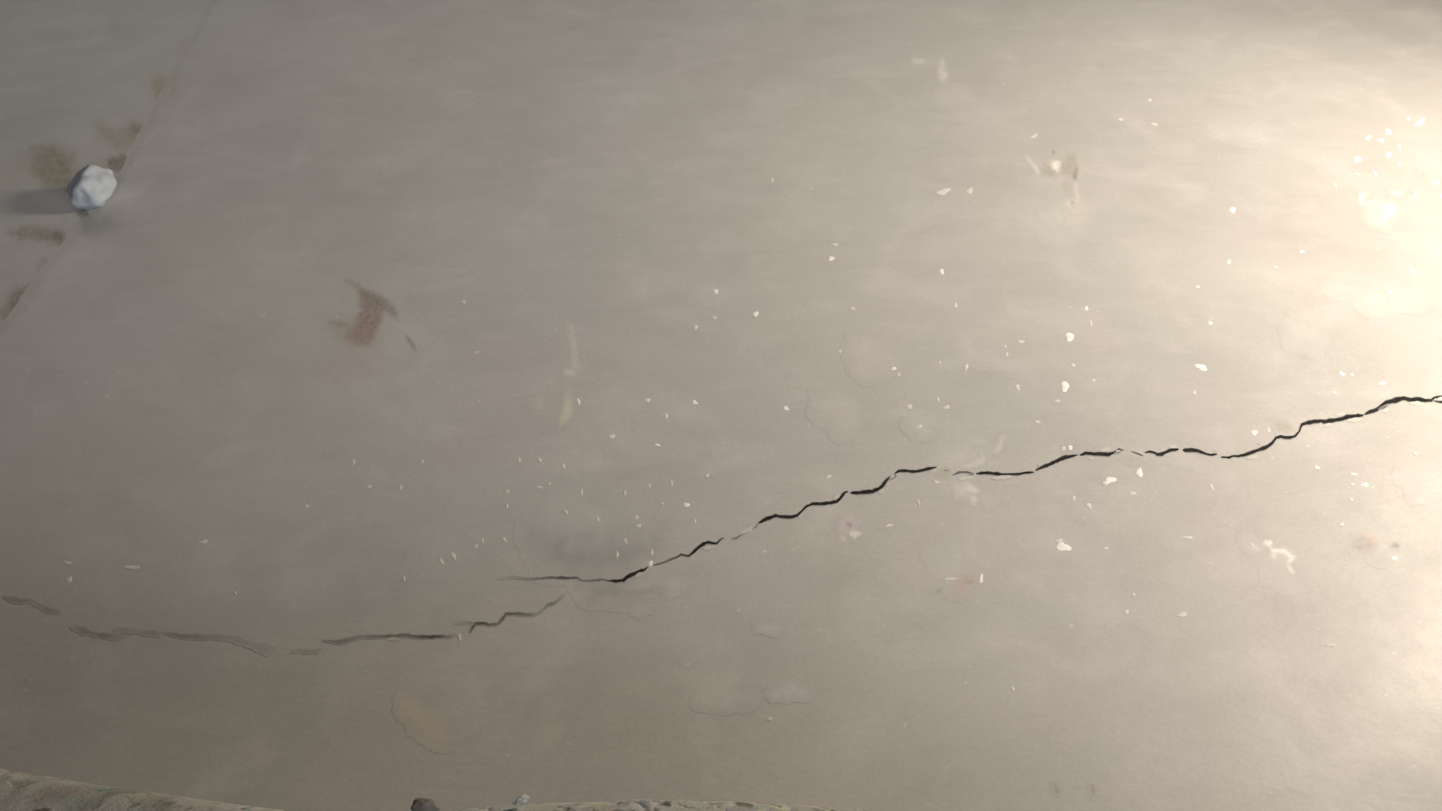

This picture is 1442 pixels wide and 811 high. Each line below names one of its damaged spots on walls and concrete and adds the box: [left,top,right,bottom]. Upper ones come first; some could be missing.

crack [3,395,1442,657]